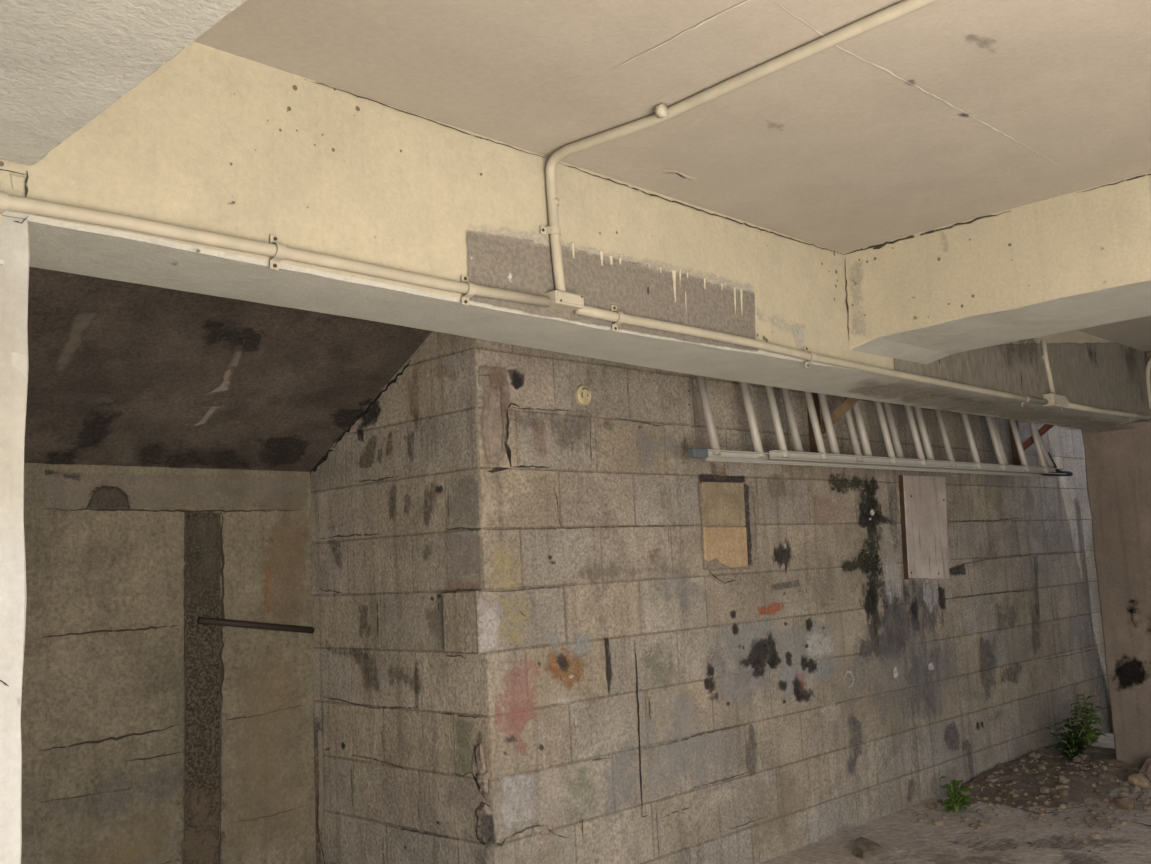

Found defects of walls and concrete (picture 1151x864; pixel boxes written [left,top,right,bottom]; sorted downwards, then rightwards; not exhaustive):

crack [1077,174,1151,193]
leakage [55,312,98,372]
leakage [205,321,261,352]
leakage [46,394,120,465]
leakage [334,398,381,441]
leakage [139,445,248,468]
leakage [257,437,307,468]
crack [44,506,307,514]
leakage [829,474,940,718]
crack [42,625,179,638]
crack [41,724,182,802]